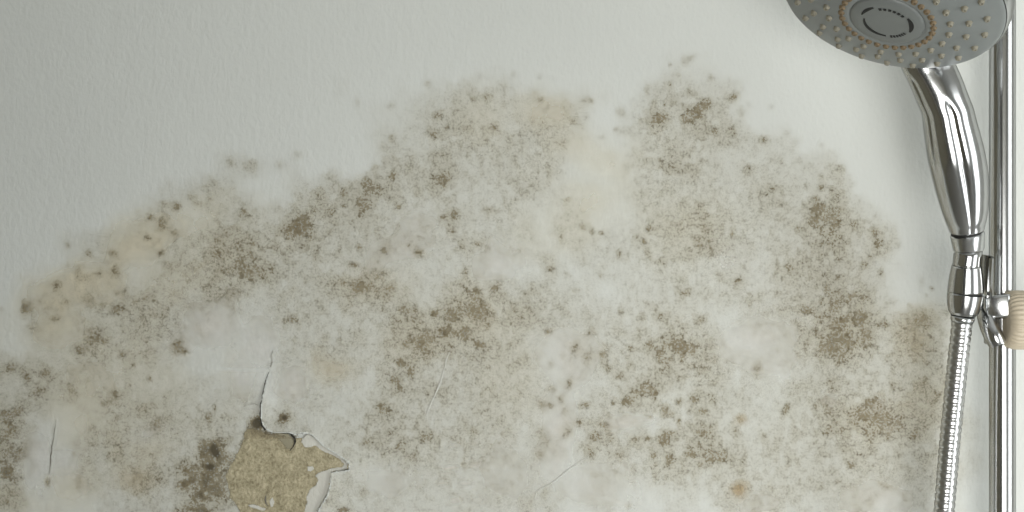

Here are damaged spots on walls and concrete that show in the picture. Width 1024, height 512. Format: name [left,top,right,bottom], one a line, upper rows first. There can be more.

damp [646,89,736,145]
damp [416,153,454,195]
damp [22,215,177,343]
damp [190,163,413,343]
damp [776,176,942,369]
damp [0,406,67,508]
damp [133,406,234,512]
crack [248,351,296,450]
damp [248,413,297,439]
peeling [225,429,349,512]
damp [317,253,745,487]
damp [813,361,945,469]